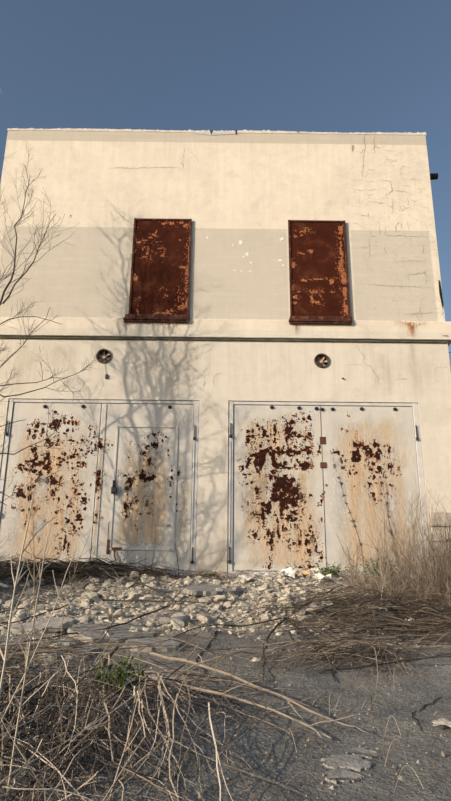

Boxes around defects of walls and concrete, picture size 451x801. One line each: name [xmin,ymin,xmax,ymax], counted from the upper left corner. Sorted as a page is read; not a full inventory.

crack [356,135,444,319]
rust [5,408,113,563]
rust [118,430,180,544]
rust [235,410,411,572]